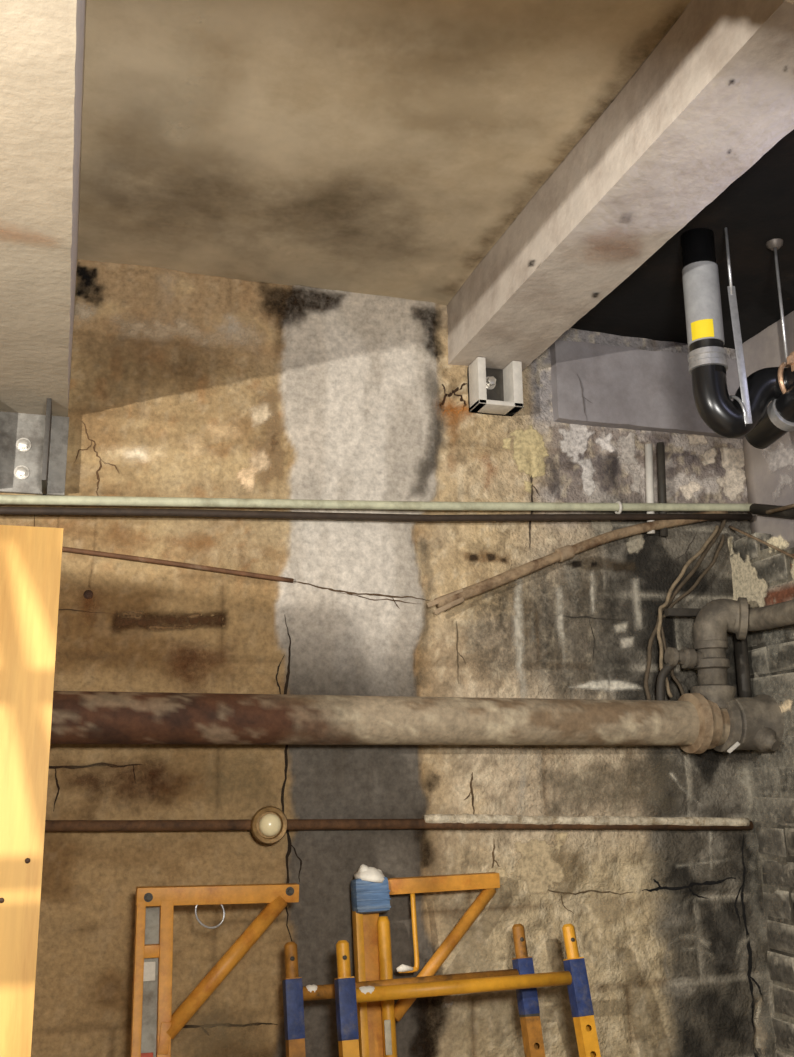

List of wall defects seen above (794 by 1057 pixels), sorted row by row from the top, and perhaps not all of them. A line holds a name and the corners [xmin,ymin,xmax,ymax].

damp [74,267,102,318]
damp [262,287,342,322]
damp [414,309,441,357]
peeling [767,536,789,552]
peeling [728,537,767,608]
crack [49,762,142,812]
crack [548,835,764,1057]